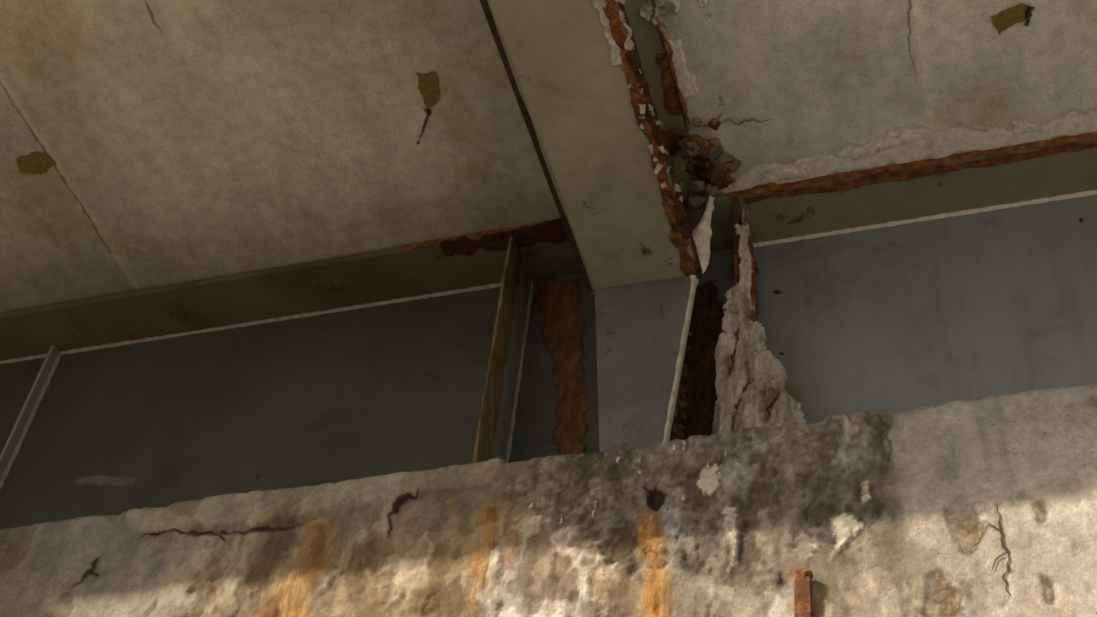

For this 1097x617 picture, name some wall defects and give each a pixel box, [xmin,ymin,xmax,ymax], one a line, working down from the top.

peeling [591,0,635,66]
corrosion [602,0,724,441]
spalling [662,117,741,285]
corrosion [728,131,1097,322]
corrosion [533,276,588,456]
crack [138,516,325,542]
corrosion [255,522,328,617]
crack [387,489,419,538]
corrosion [637,487,668,617]
peeling [697,465,720,495]
peeling [832,513,860,550]
crack [987,504,1010,606]